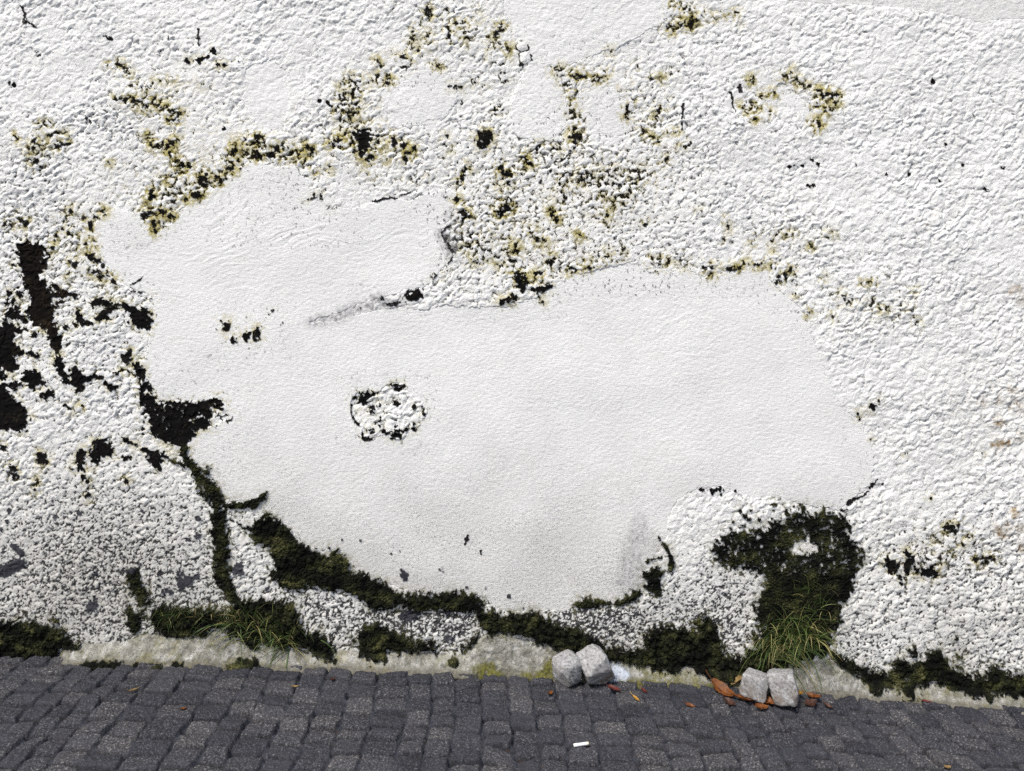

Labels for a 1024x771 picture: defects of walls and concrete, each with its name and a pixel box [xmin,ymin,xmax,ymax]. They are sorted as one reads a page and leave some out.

water stain [661,0,744,36]
water stain [11,118,72,174]
water stain [105,4,514,238]
water stain [738,68,843,134]
water stain [438,56,692,311]
water stain [359,269,453,309]
water stain [645,223,802,299]
water stain [860,266,922,326]
water stain [0,203,232,499]
water stain [880,519,996,586]